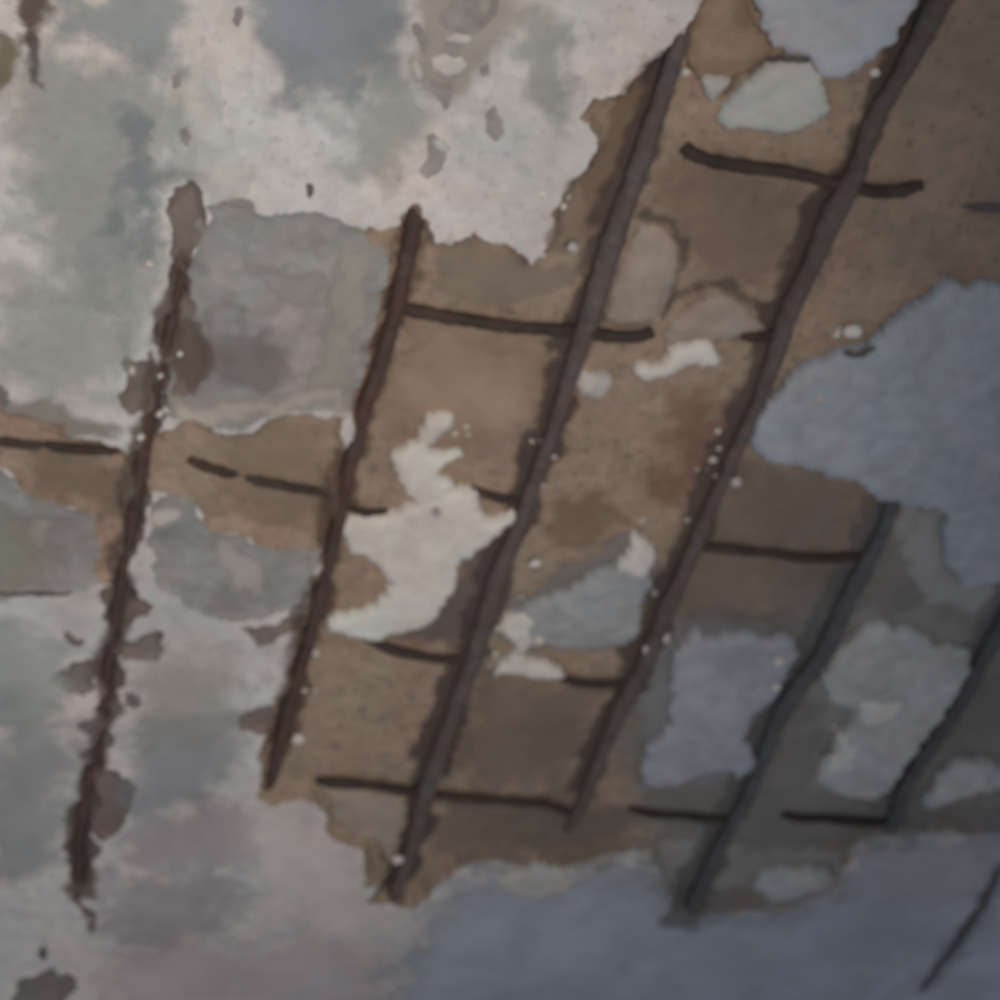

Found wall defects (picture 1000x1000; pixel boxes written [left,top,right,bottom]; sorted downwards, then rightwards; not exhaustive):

spalling [233,7,243,27]
damp [260,0,404,99]
damp [0,621,71,879]
spalling [72,894,97,933]
corrosion [65,253,212,900]
damp [100,719,385,1000]
peeling [0,179,600,885]
corrosion [373,526,513,898]
corrosion [506,50,667,512]
spalling [256,0,1000,916]
corrosion [568,187,834,791]
damp [848,527,982,641]